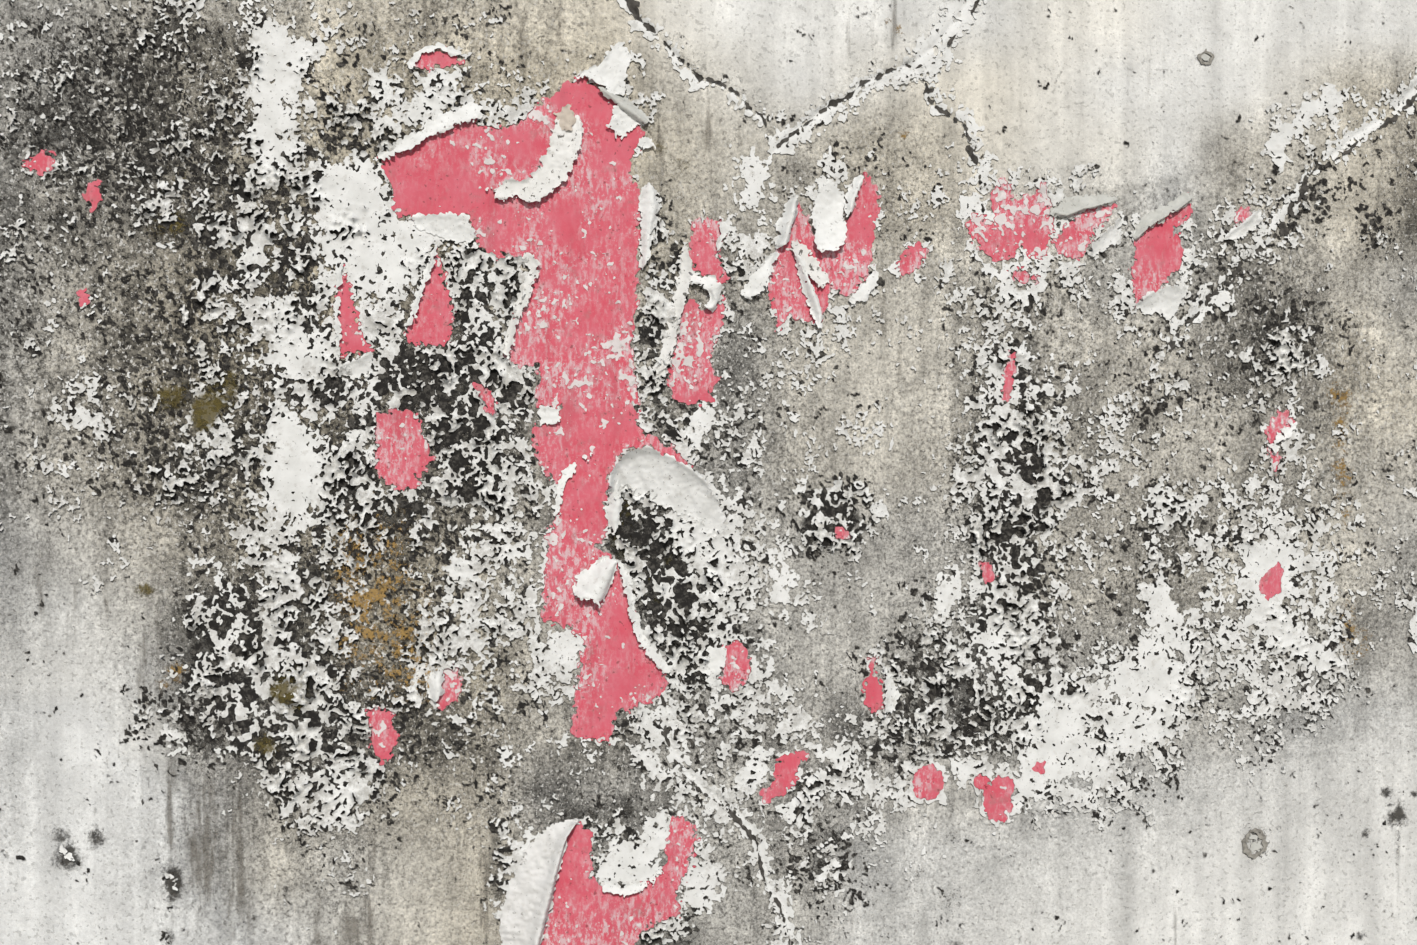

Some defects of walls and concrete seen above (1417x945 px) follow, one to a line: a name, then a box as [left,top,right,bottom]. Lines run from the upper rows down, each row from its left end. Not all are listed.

damp [0,0,313,308]
crack [617,0,999,192]
peeling [762,0,979,154]
crack [1157,75,1417,365]
damp [1185,264,1350,399]
peeling [835,393,894,456]
peeling [1372,439,1417,499]
peeling [434,795,472,830]